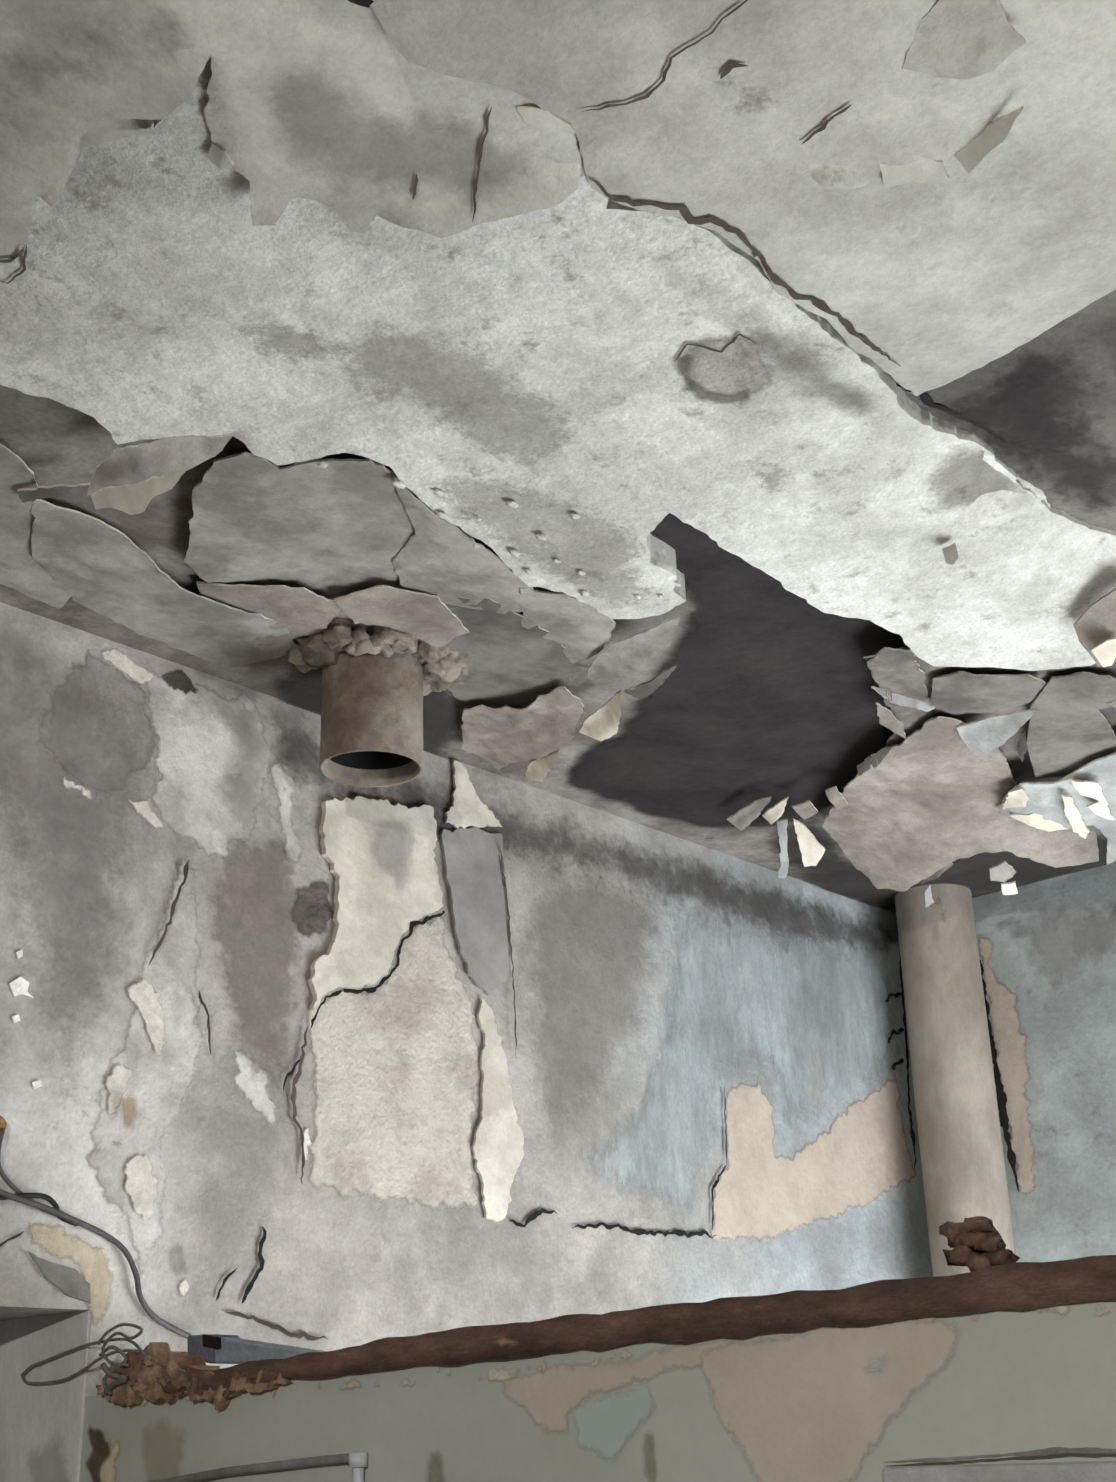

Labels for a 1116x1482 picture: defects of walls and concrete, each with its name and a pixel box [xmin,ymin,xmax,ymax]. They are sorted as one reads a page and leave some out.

crack [582,0,748,112]
crack [802,104,852,144]
crack [589,179,1003,440]
flaking render [0,0,1116,908]
damp [949,358,1116,509]
spalling [39,649,303,1275]
flaking render [283,760,524,1222]
damp [283,731,894,1205]
peeling [711,1080,915,1241]
crack [216,1226,328,1341]
peeling [487,1315,956,1482]
crack [883,1447,1116,1463]